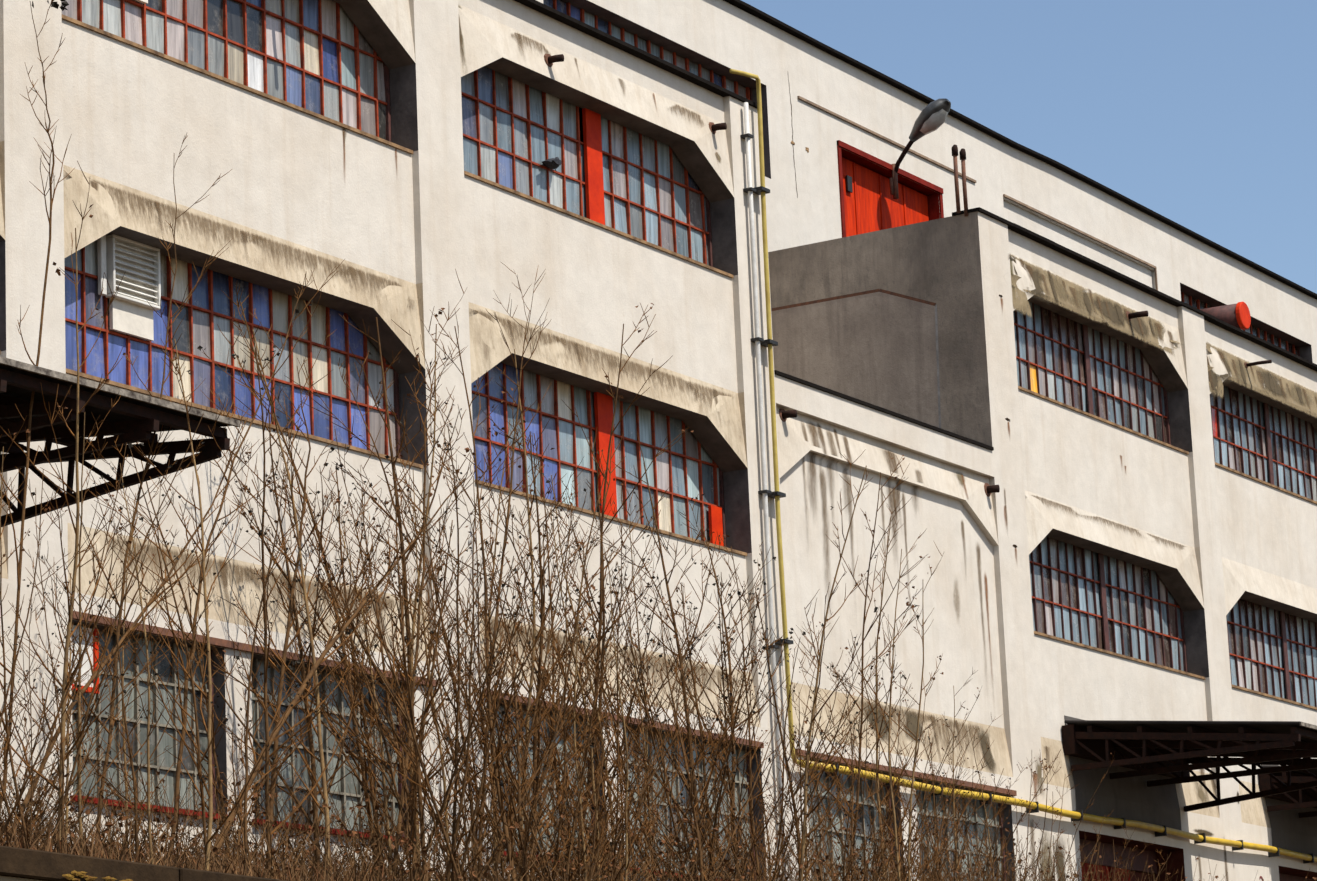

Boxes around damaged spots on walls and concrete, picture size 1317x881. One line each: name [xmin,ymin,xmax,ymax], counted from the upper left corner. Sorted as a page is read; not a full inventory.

water stain [803,423,853,555]
water stain [881,450,921,552]
water stain [977,547,990,641]